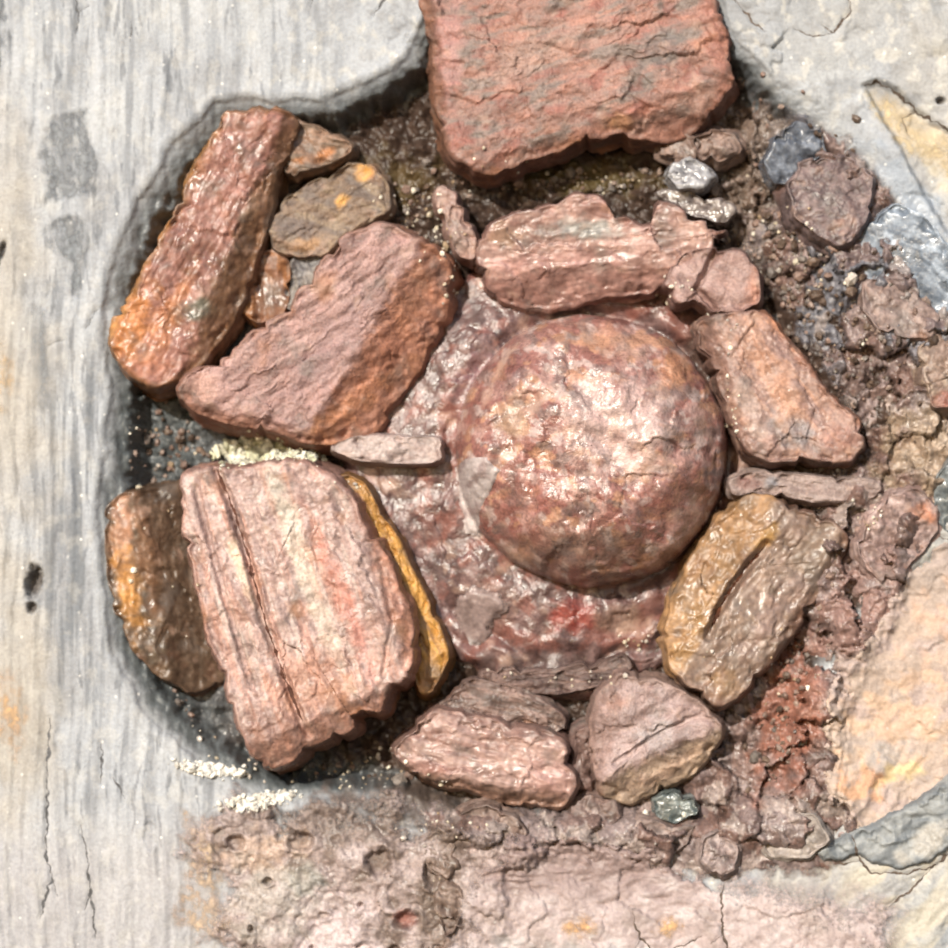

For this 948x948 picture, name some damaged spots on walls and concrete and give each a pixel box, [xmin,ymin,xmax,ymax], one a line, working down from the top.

water stain [49,219,84,290]
water stain [44,111,97,200]
peeling [653,125,747,227]
peeling [758,121,877,261]
crack [864,79,948,134]
peeling [857,279,948,419]
spalling [761,458,948,870]
spalling [179,717,895,948]